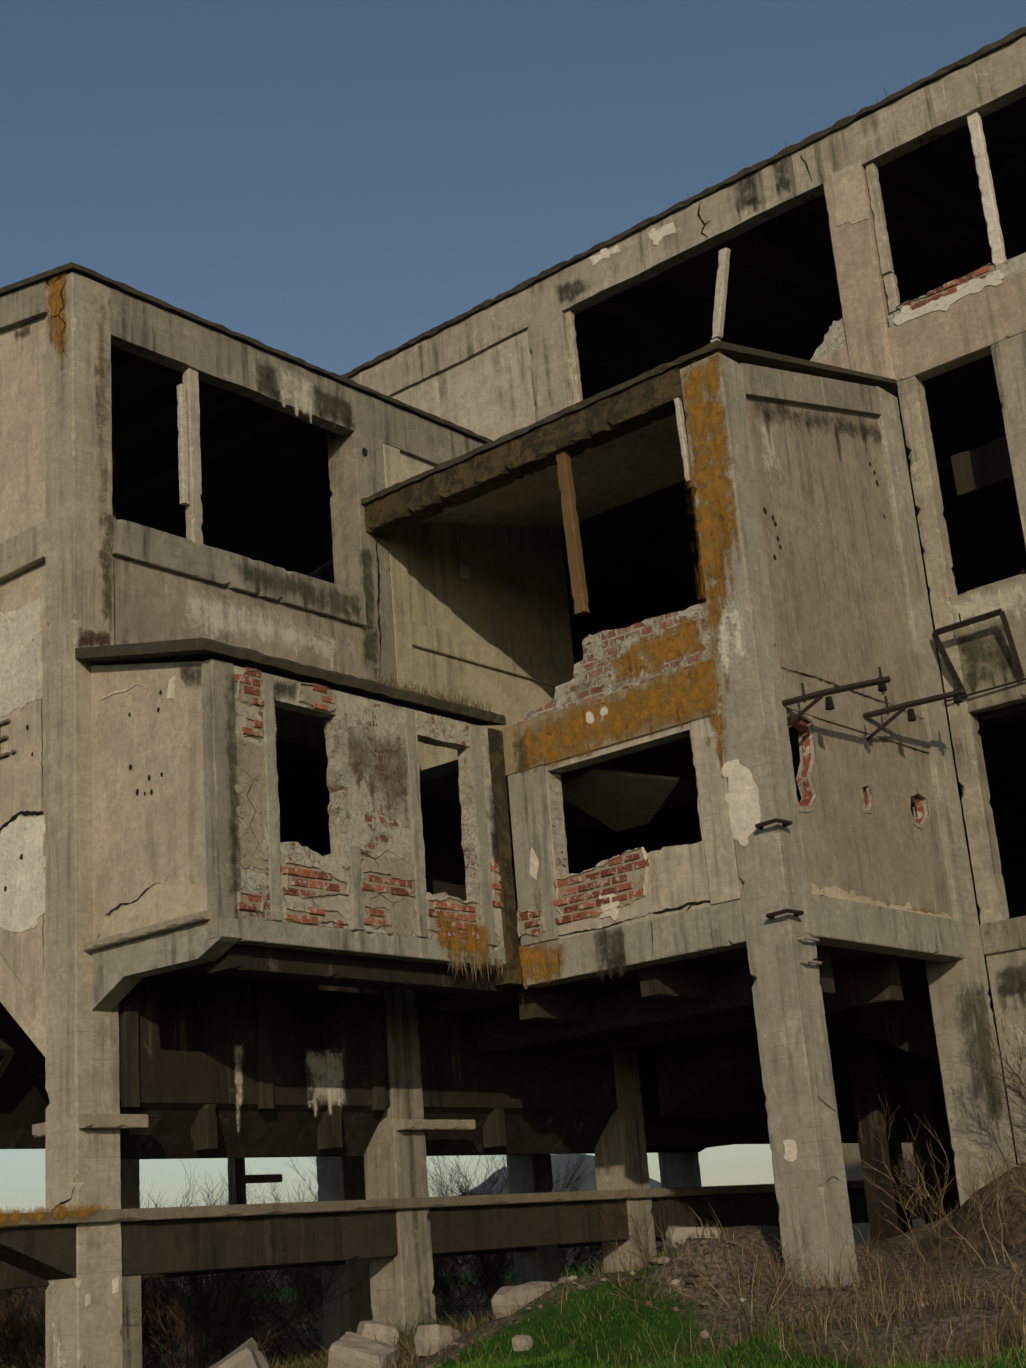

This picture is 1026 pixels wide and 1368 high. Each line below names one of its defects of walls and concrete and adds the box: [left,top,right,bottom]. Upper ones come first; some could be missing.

crack [697,202,711,237]
rust [48,274,66,369]
peeling [894,263,1005,326]
rust [521,353,738,778]
flaking render [233,667,650,940]
peeling [722,759,761,847]
peeling [0,810,46,933]
crack [97,875,169,938]
rust [437,913,489,959]
leakage [307,1052,345,1116]